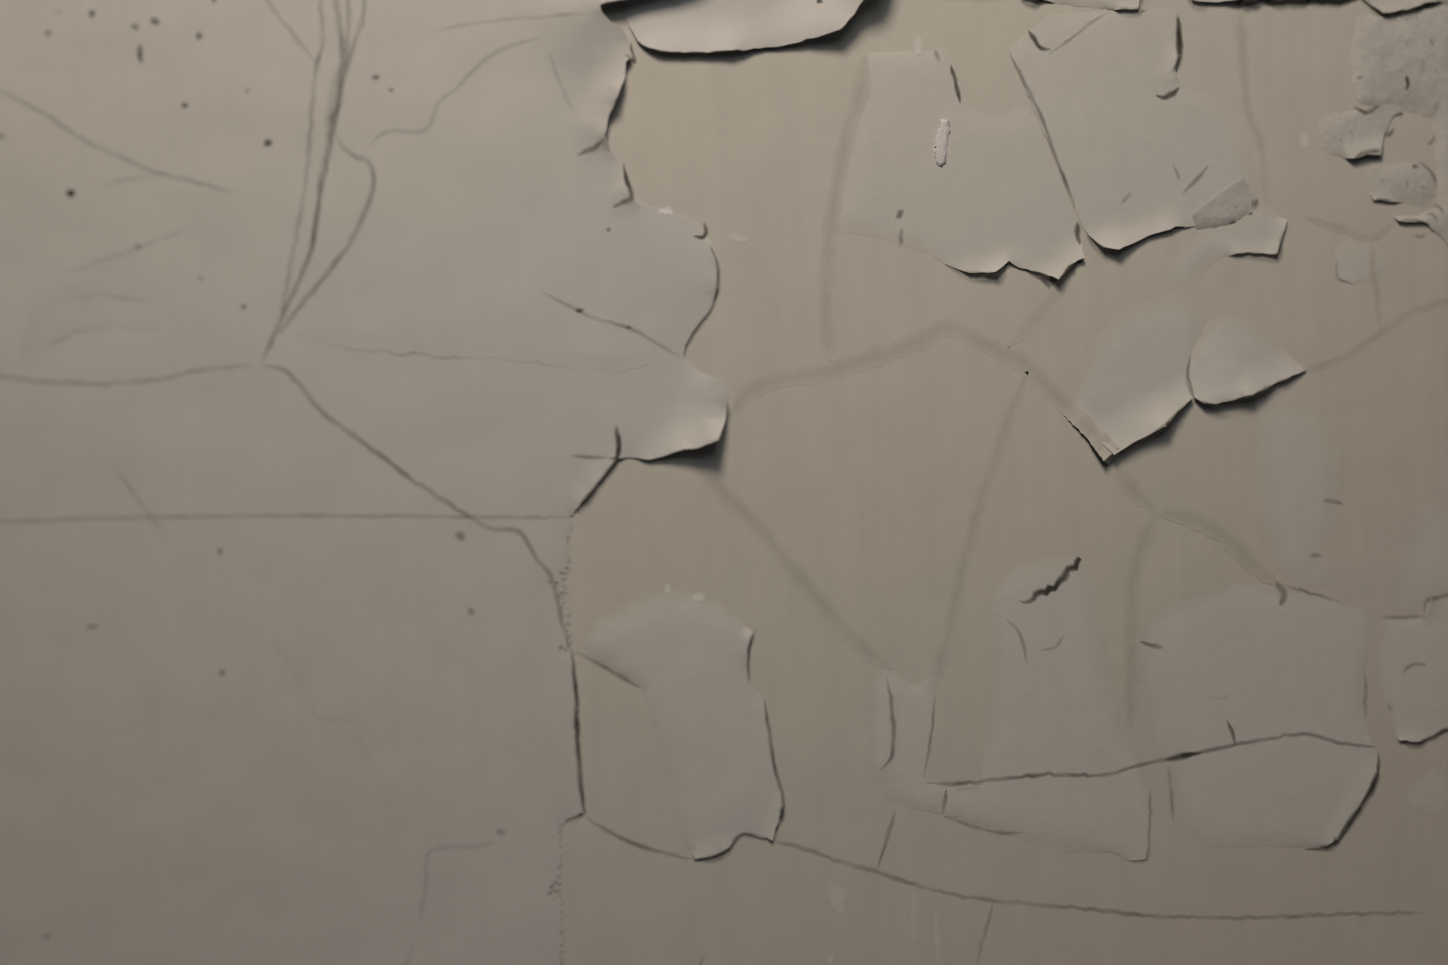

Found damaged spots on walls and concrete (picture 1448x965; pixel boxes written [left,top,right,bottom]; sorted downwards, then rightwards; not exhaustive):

peeling [836,0,1305,455]
peeling [1315,0,1448,246]
peeling [0,0,863,965]
crack [573,669,586,813]
peeling [944,555,1151,861]
peeling [1141,489,1448,849]